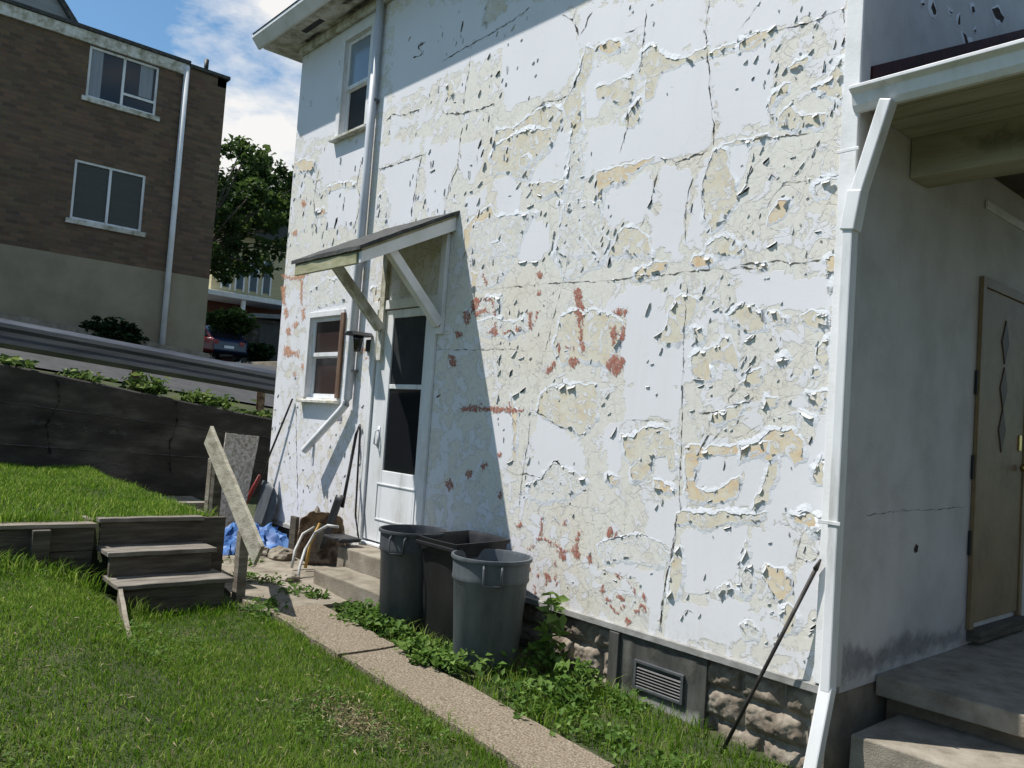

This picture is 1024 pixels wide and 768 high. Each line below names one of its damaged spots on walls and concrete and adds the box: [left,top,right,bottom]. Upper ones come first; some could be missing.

crack [562,13,591,36]
peeling [990,5,1004,27]
crack [413,7,530,199]
crack [640,3,715,234]
crack [741,133,807,142]
peeling [291,157,363,246]
peeling [376,188,392,228]
crack [352,154,425,229]
peeling [308,276,349,313]
peeling [369,283,393,311]
peeling [409,9,845,644]
crack [440,259,821,632]